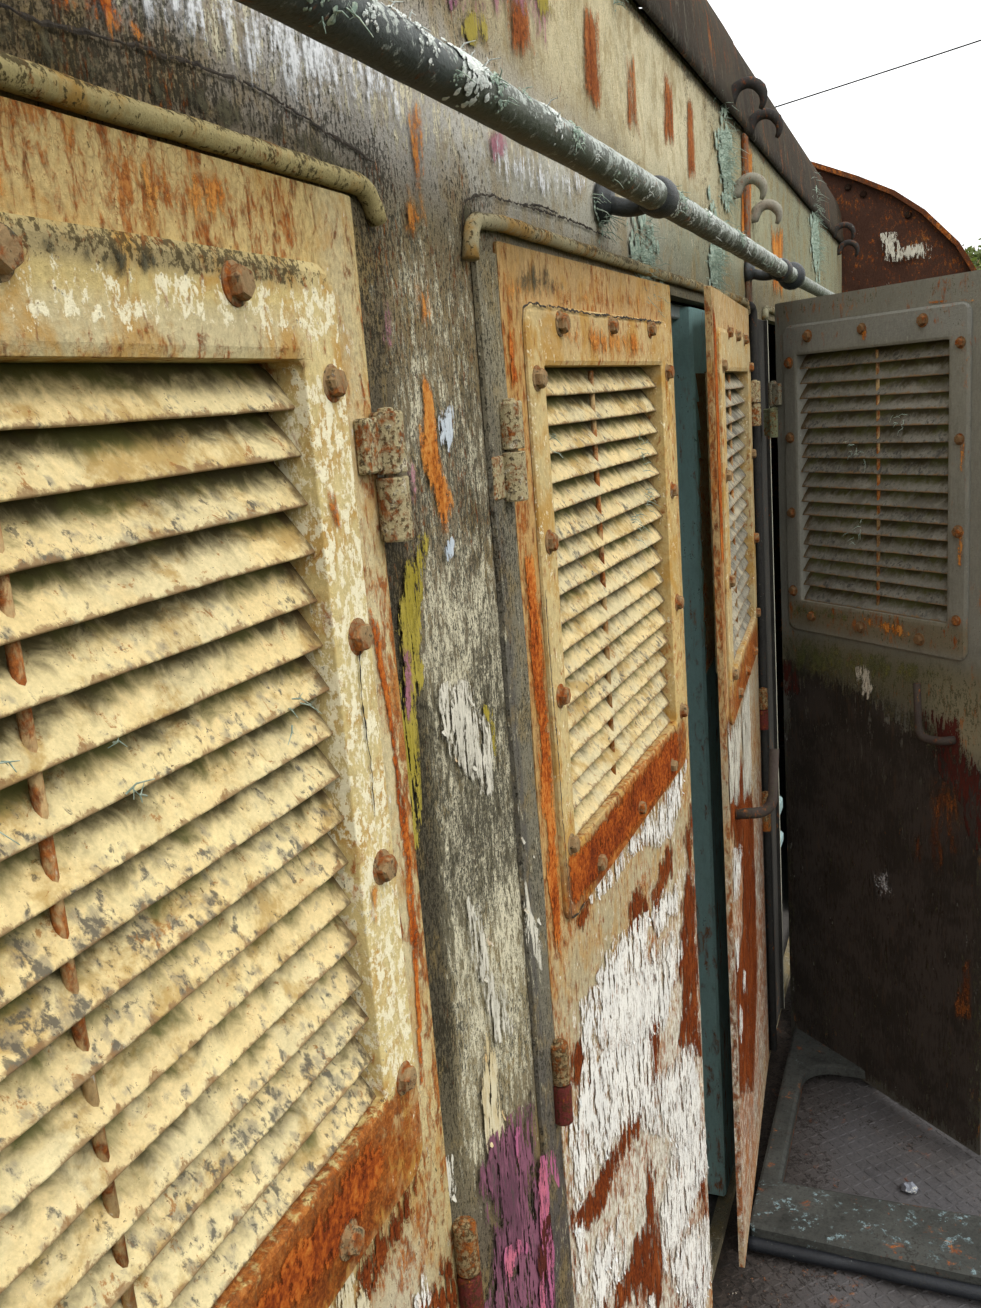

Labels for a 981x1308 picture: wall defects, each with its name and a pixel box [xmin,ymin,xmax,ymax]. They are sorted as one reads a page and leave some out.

corrosion [584,6,602,108]
corrosion [664,72,696,179]
peeling [438,405,455,452]
peeling [439,679,494,798]
corrosion [525,550,678,956]
peeling [589,760,687,904]
corrosion [727,717,758,1098]
peeling [565,883,712,1308]
corrosion [251,1141,384,1308]
peeling [329,1272,372,1308]
corrosion [343,1173,417,1301]
peeling [411,1274,431,1308]